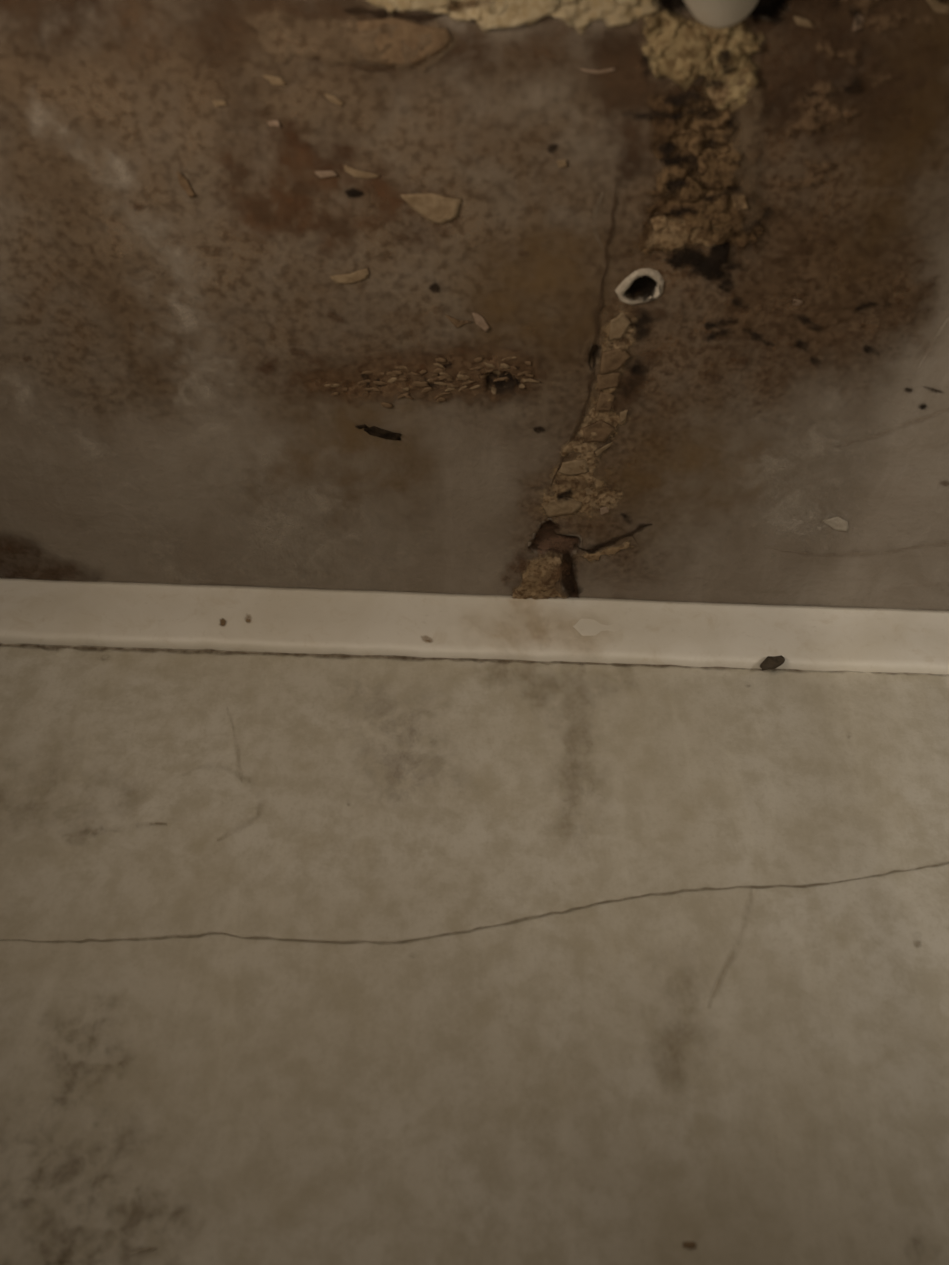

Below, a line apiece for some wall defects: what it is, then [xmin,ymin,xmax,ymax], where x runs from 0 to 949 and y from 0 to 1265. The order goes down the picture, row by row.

spalling [244,0,772,256]
leakage [0,539,78,581]
leakage [0,0,949,571]
crack [548,180,619,493]
spalling [505,296,665,600]
crack [7,864,943,943]